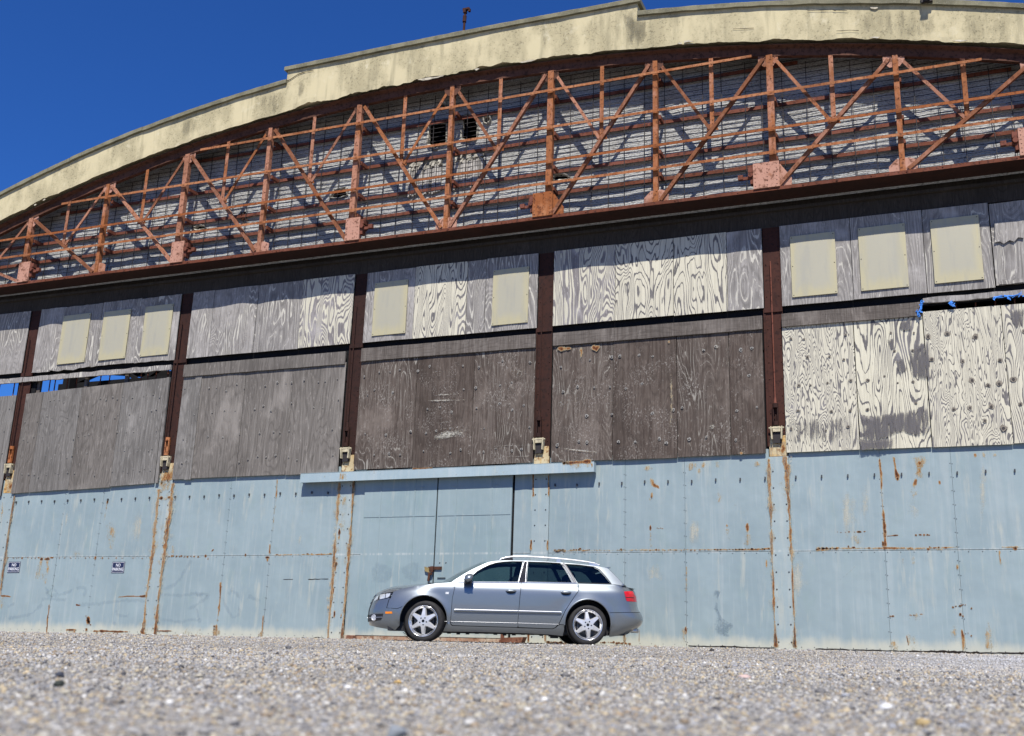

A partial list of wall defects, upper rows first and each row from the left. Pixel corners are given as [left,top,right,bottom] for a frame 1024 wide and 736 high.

rust [0,480,53,608]
rust [66,470,214,635]
rust [265,474,355,639]
rust [547,442,797,648]
rust [816,457,956,551]